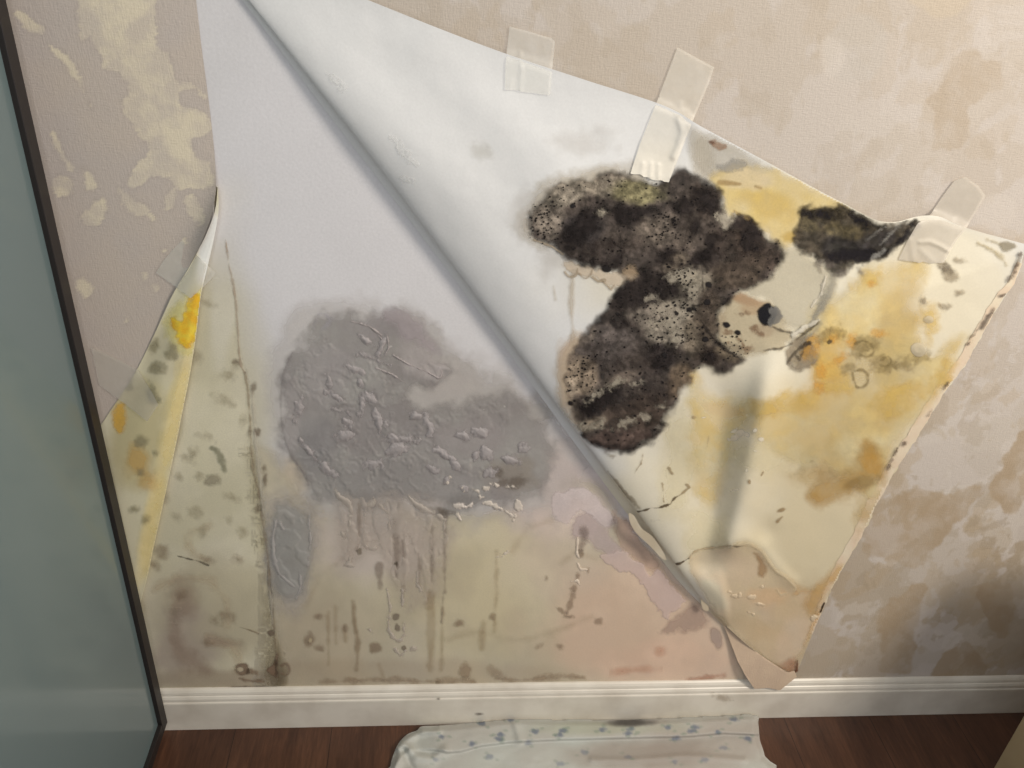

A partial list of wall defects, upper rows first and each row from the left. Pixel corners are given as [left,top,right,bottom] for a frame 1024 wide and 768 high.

water stain [982,242,1023,297]
water stain [114,404,124,432]
water stain [141,132,970,688]
peeling [365,479,523,535]
crack [618,468,690,512]